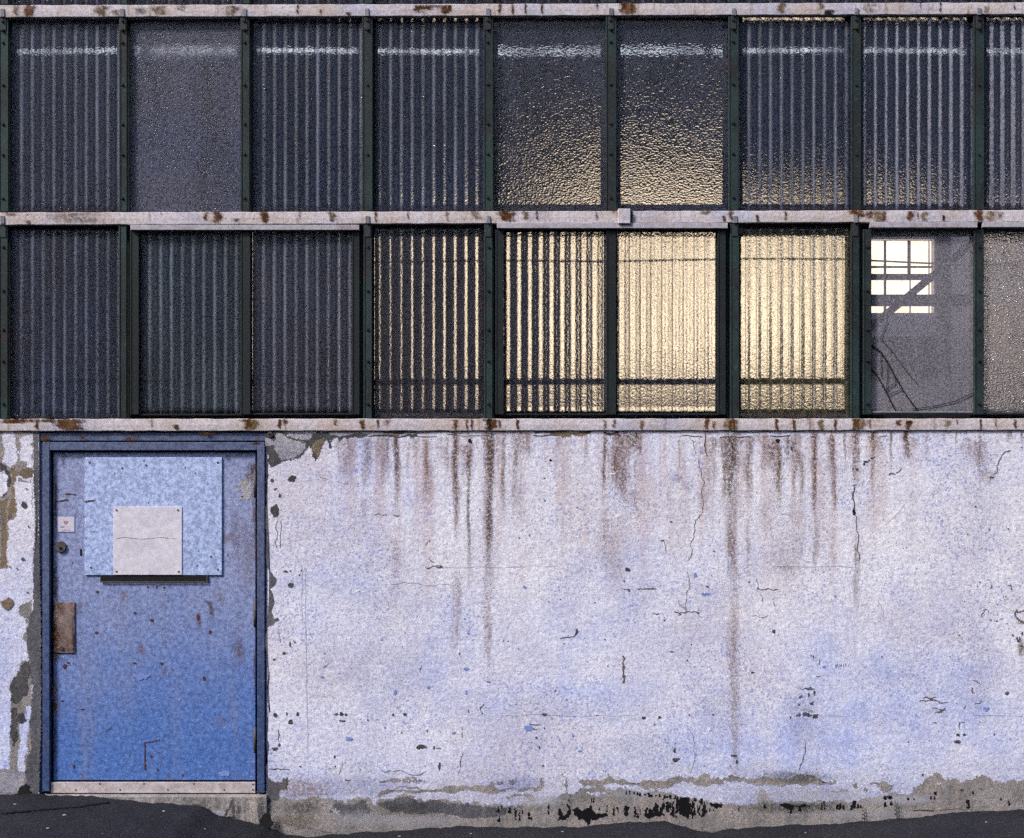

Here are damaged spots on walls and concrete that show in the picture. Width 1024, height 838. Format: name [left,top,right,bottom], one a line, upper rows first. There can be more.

corrosion [413,5,451,13]
corrosion [499,211,538,221]
corrosion [849,210,886,221]
corrosion [973,210,1003,220]
corrosion [2,419,85,441]
corrosion [452,419,501,519]
corrosion [802,419,874,499]
crack [623,430,844,615]
crack [797,467,901,567]
peeling [0,431,42,795]
peeling [259,431,1024,837]
water stain [568,790,714,825]